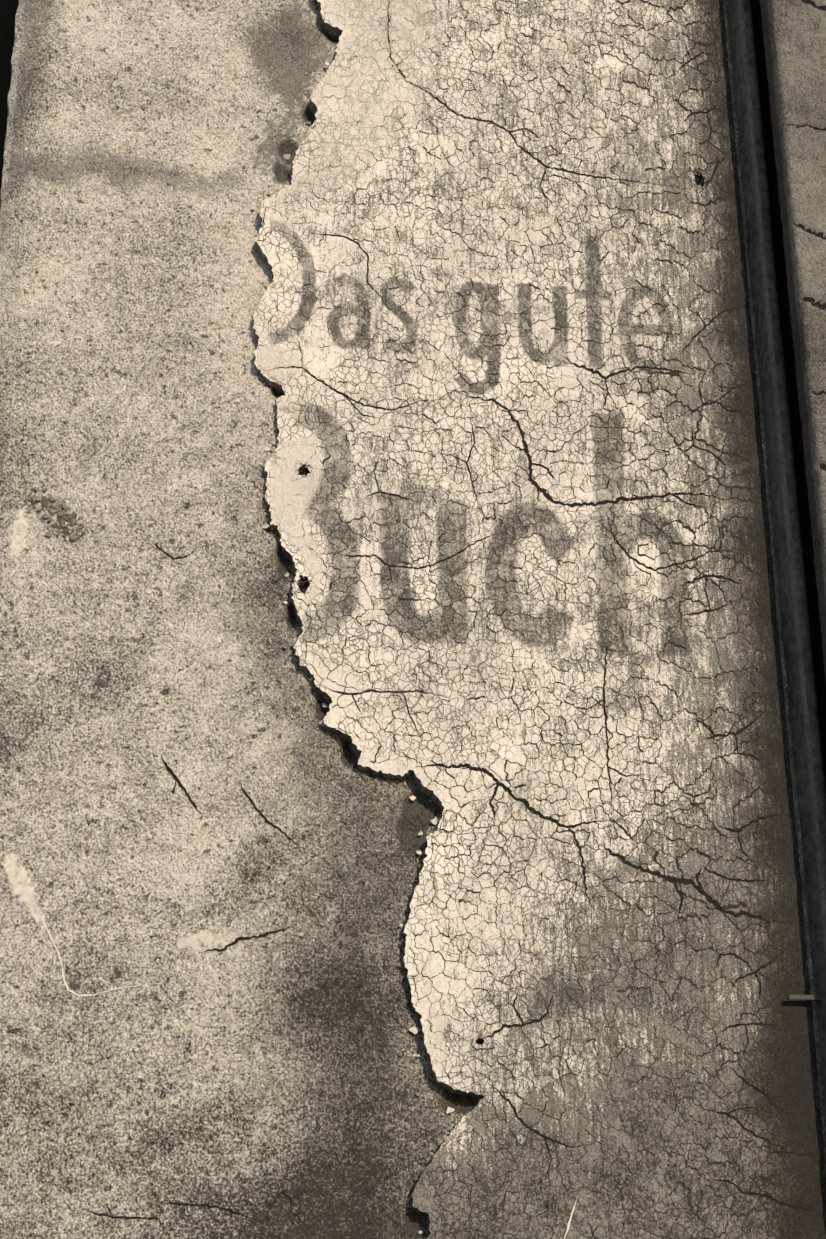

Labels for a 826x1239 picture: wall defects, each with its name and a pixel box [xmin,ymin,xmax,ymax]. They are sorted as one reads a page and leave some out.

peeling [0,0,485,1239]
crack [238,779,302,848]
crack [260,0,826,1239]
spalling [694,171,707,187]